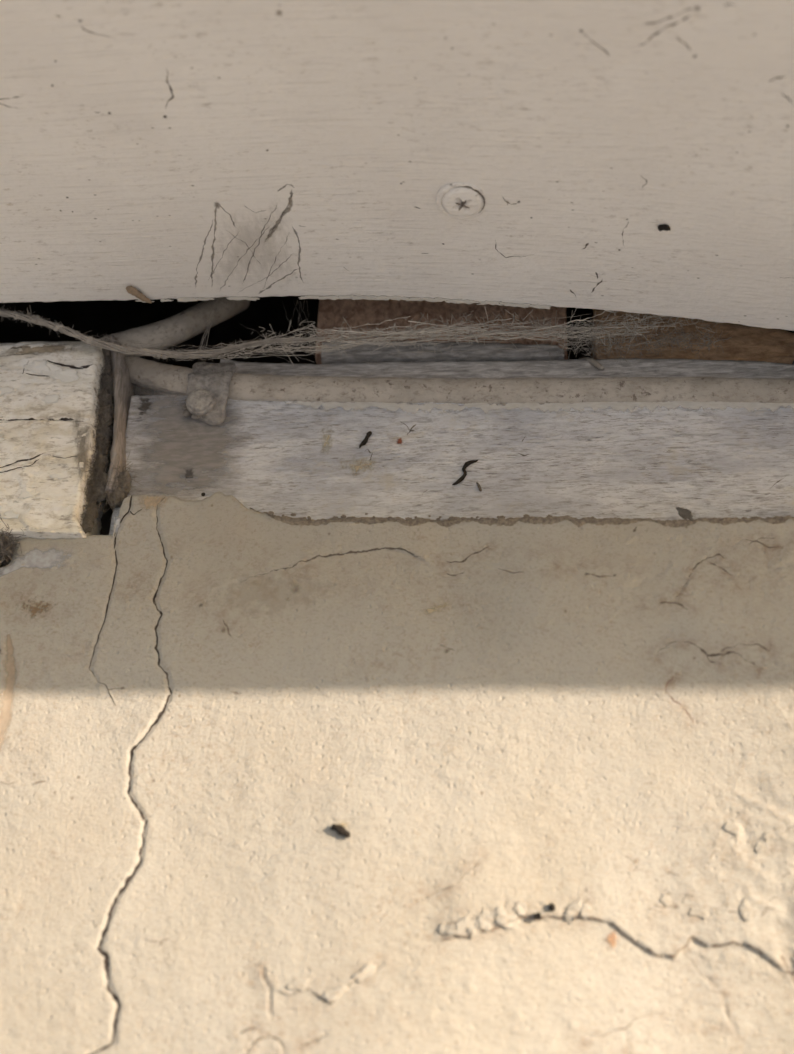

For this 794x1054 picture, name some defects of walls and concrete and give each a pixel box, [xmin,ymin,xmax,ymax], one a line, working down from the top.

crack [0,416,85,424]
crack [0,453,74,473]
crack [244,547,418,581]
crack [446,547,487,576]
crack [89,496,172,1054]